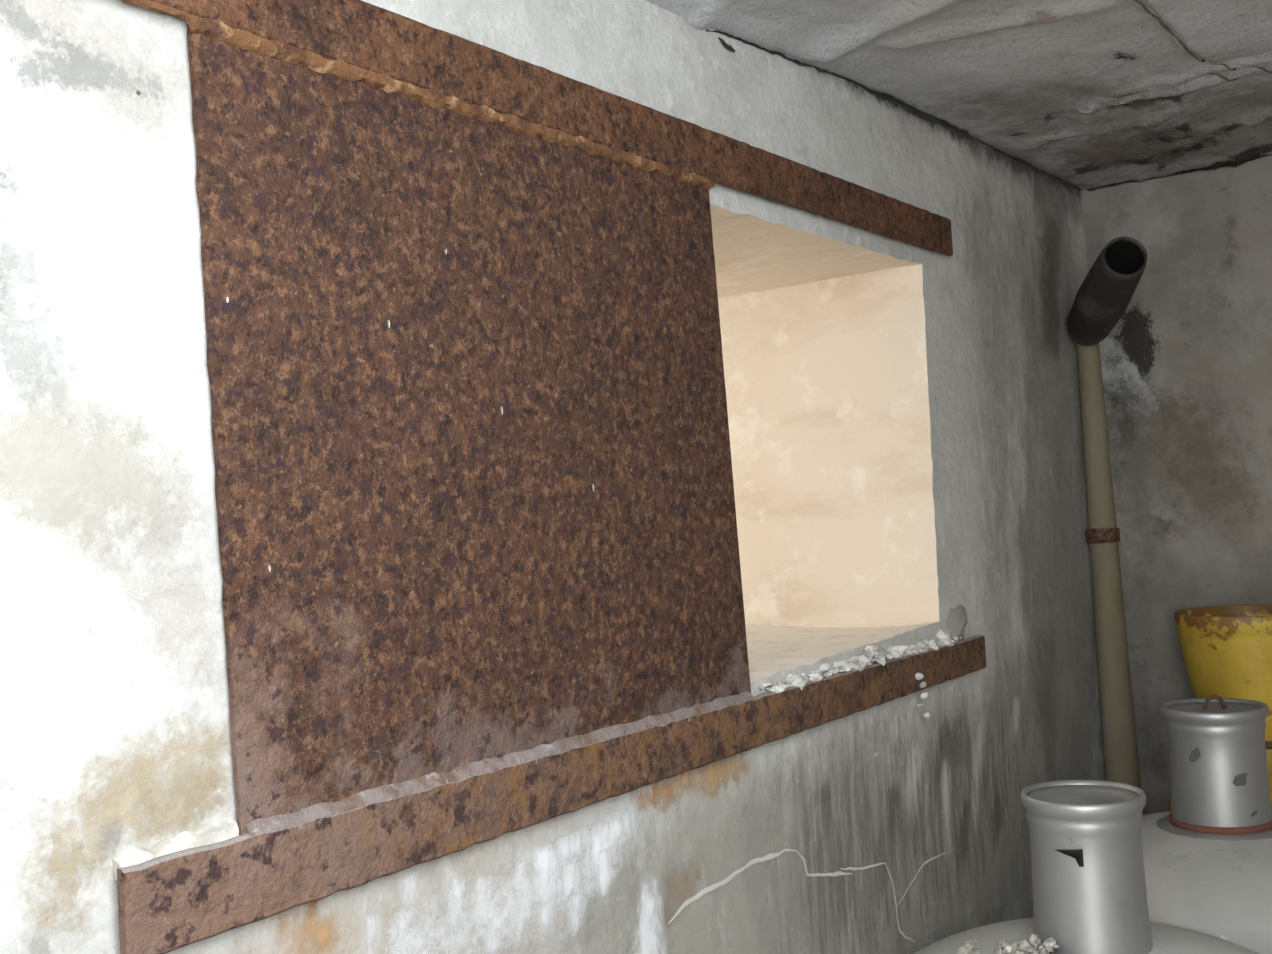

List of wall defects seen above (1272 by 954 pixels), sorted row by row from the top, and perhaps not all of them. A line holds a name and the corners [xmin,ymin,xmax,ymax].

crack [1134,0,1272,81]
damp [967,86,1272,167]
corrosion [638,754,744,808]
damp [43,732,227,918]
corrosion [300,901,332,951]
damp [368,813,635,954]
damp [636,881,664,954]
corrosion [666,865,700,922]
crack [668,849,952,942]